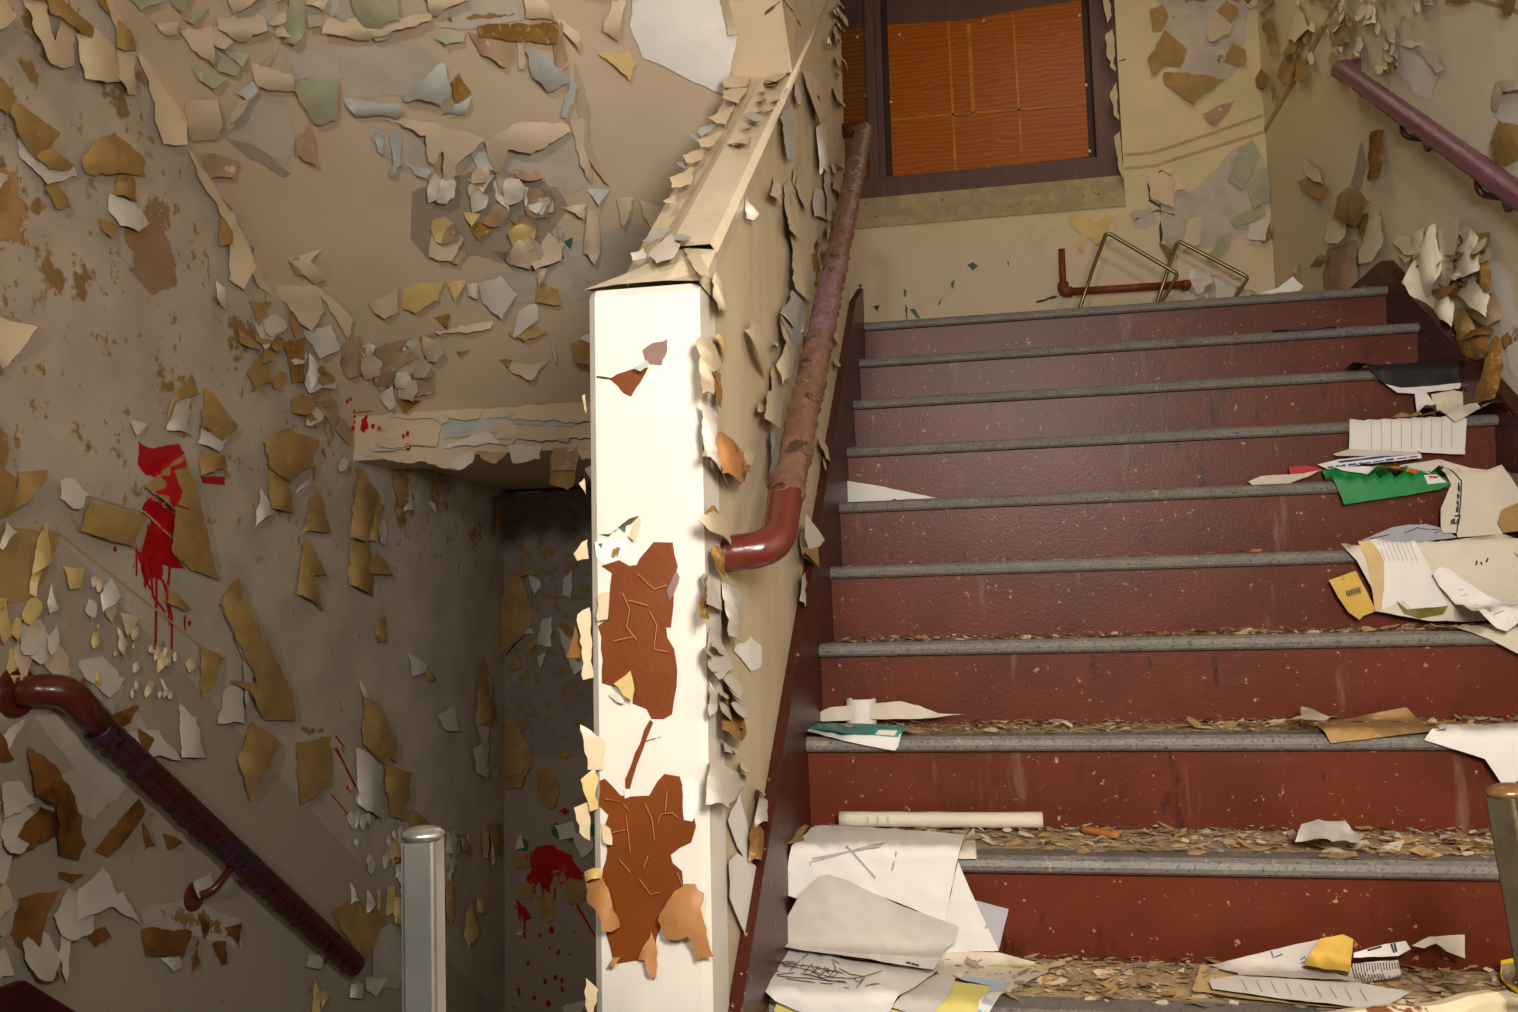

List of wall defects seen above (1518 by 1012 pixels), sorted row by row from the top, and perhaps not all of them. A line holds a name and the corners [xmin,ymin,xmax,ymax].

peeling [1148,0,1471,124]
peeling [1491,80,1518,165]
peeling [0,0,849,612]
peeling [842,622,1491,643]
peeling [0,372,430,999]
peeling [437,505,768,978]
peeling [876,707,1518,735]
peeling [788,825,809,844]
peeling [872,819,1495,859]
peeling [306,955,329,1012]
peeling [562,978,598,1012]
peeling [815,935,1514,1010]